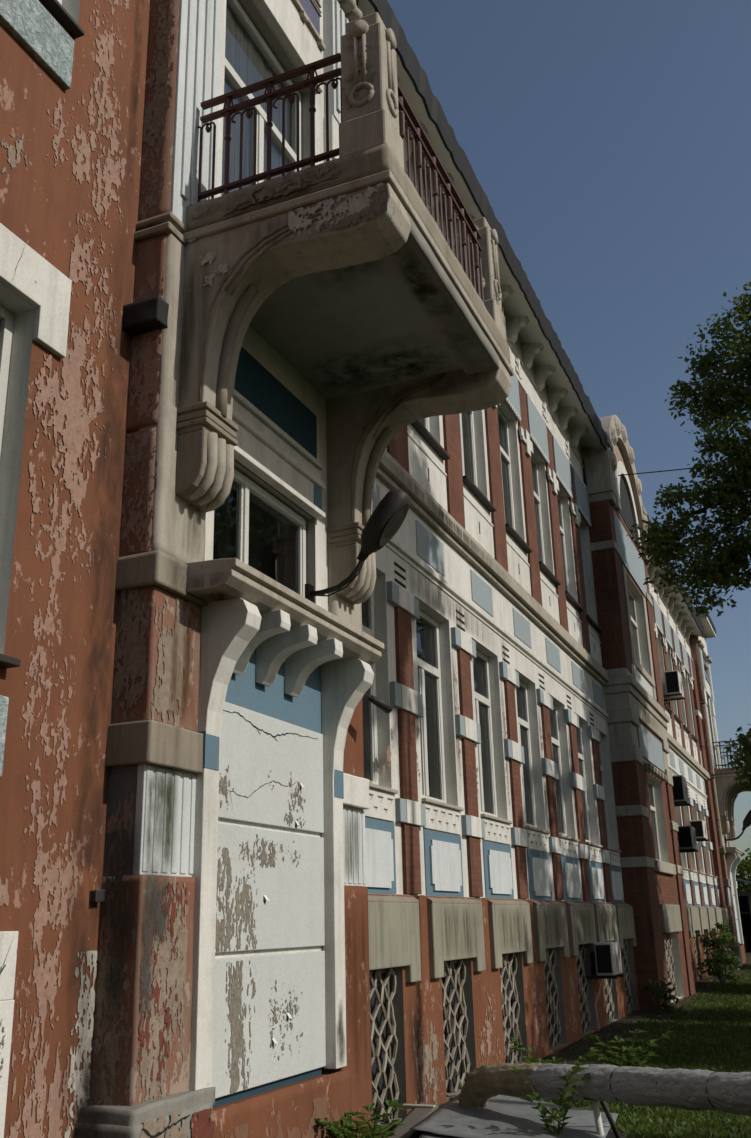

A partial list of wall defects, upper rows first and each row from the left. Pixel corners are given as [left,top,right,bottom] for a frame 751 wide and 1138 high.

flaking render [288,183,387,237]
flaking render [0,0,194,1138]
crack [224,710,317,739]